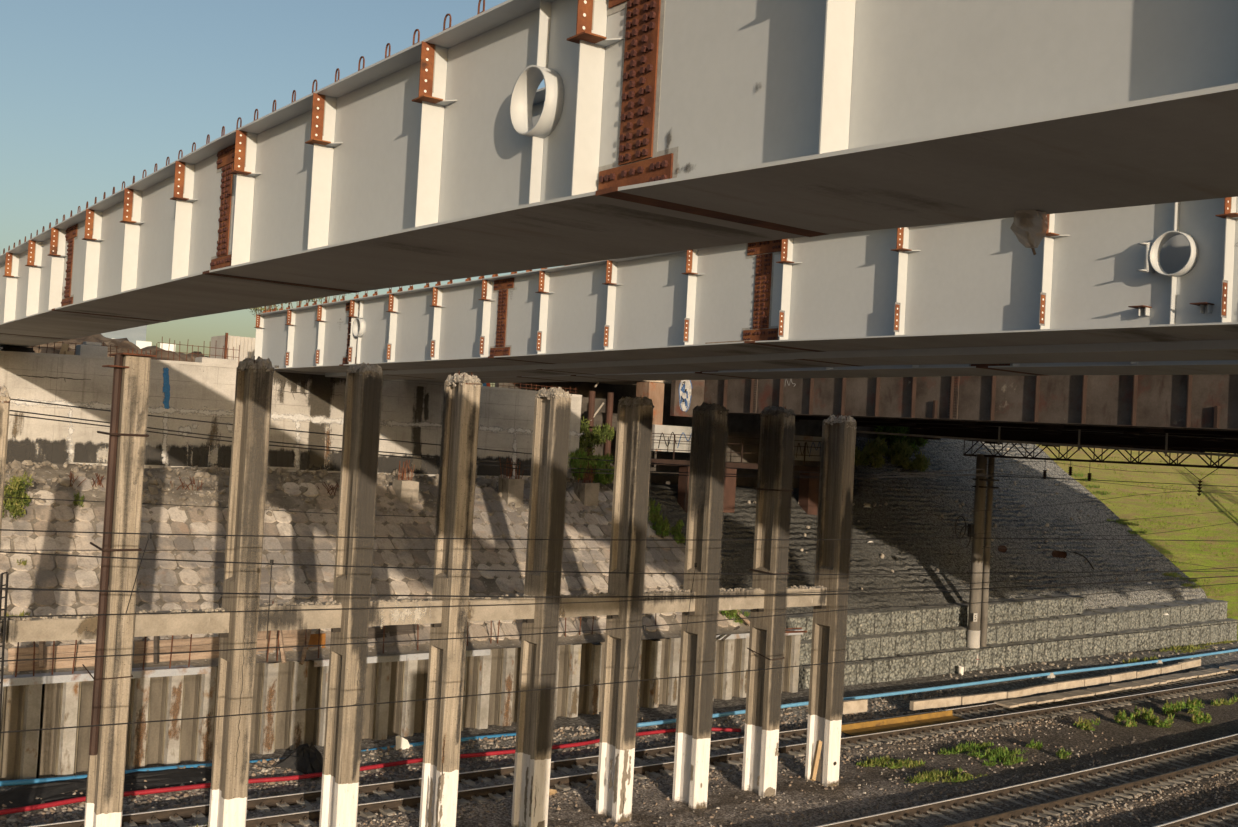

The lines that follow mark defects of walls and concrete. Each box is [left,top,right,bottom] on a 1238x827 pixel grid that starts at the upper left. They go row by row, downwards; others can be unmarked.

leakage [208,446,218,465]